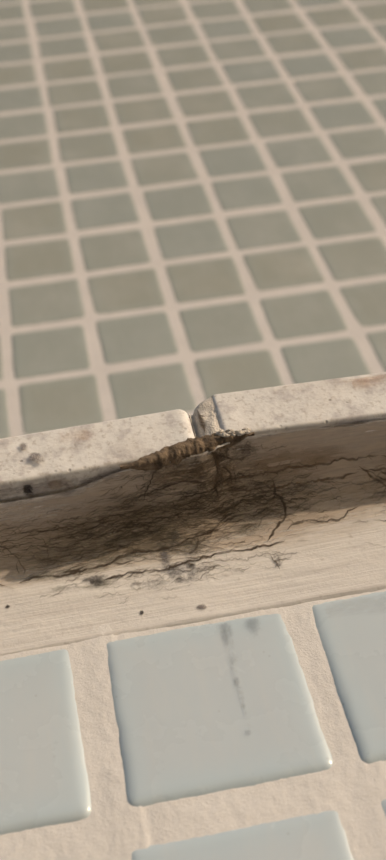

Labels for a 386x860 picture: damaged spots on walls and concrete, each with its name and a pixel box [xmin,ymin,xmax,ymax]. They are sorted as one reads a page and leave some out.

crack [0,410,386,586]
water stain [0,422,386,580]
spalling [215,428,251,444]